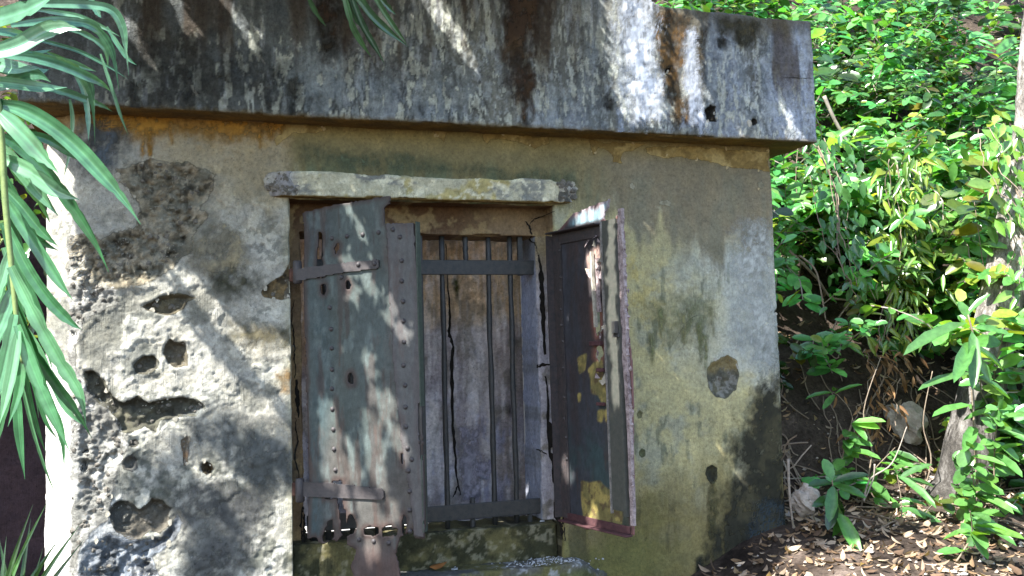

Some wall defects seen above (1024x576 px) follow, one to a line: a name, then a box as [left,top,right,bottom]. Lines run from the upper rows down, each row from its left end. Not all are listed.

corrosion [91,114,284,155]
damp [314,0,345,62]
damp [500,0,540,122]
damp [604,0,664,134]
corrosion [655,10,689,135]
spalling [704,104,718,122]
spalling [261,265,291,303]
spalling [65,158,216,576]
crack [525,211,555,484]
spalling [707,355,739,399]
damp [696,224,785,572]
crack [554,509,566,541]